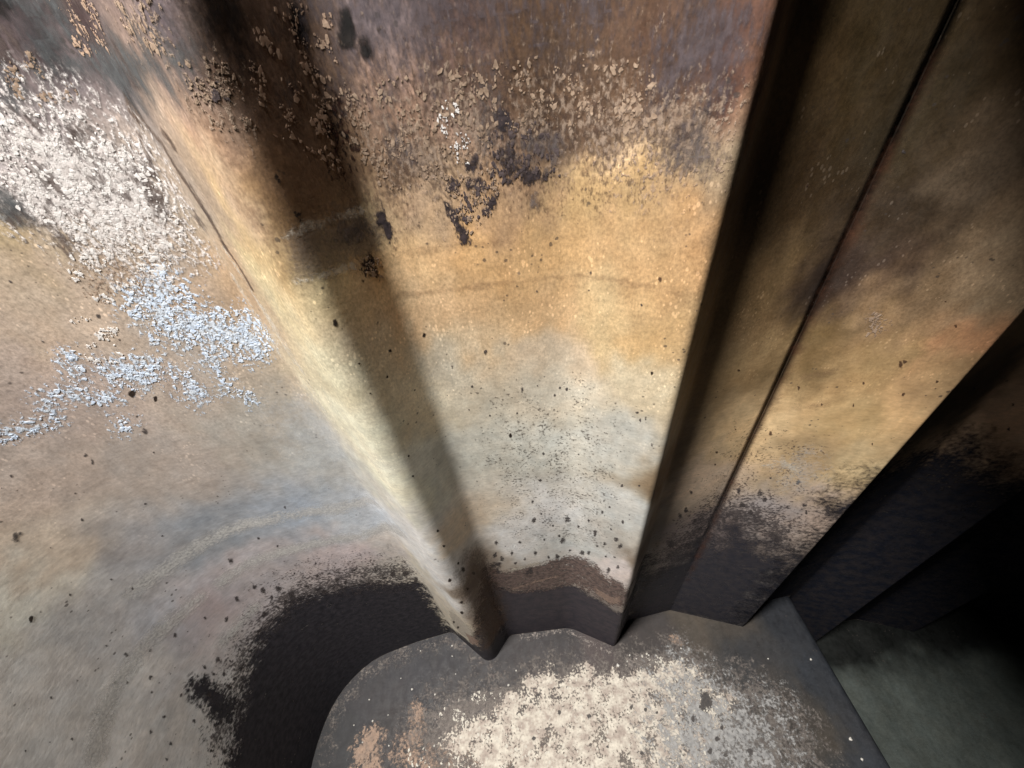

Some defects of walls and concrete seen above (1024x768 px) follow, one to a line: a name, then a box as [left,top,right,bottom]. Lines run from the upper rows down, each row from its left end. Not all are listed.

peeling [106,0,267,152]
peeling [437,84,560,245]
peeling [583,84,757,197]
peeling [376,203,392,243]
leakage [401,701,427,756]